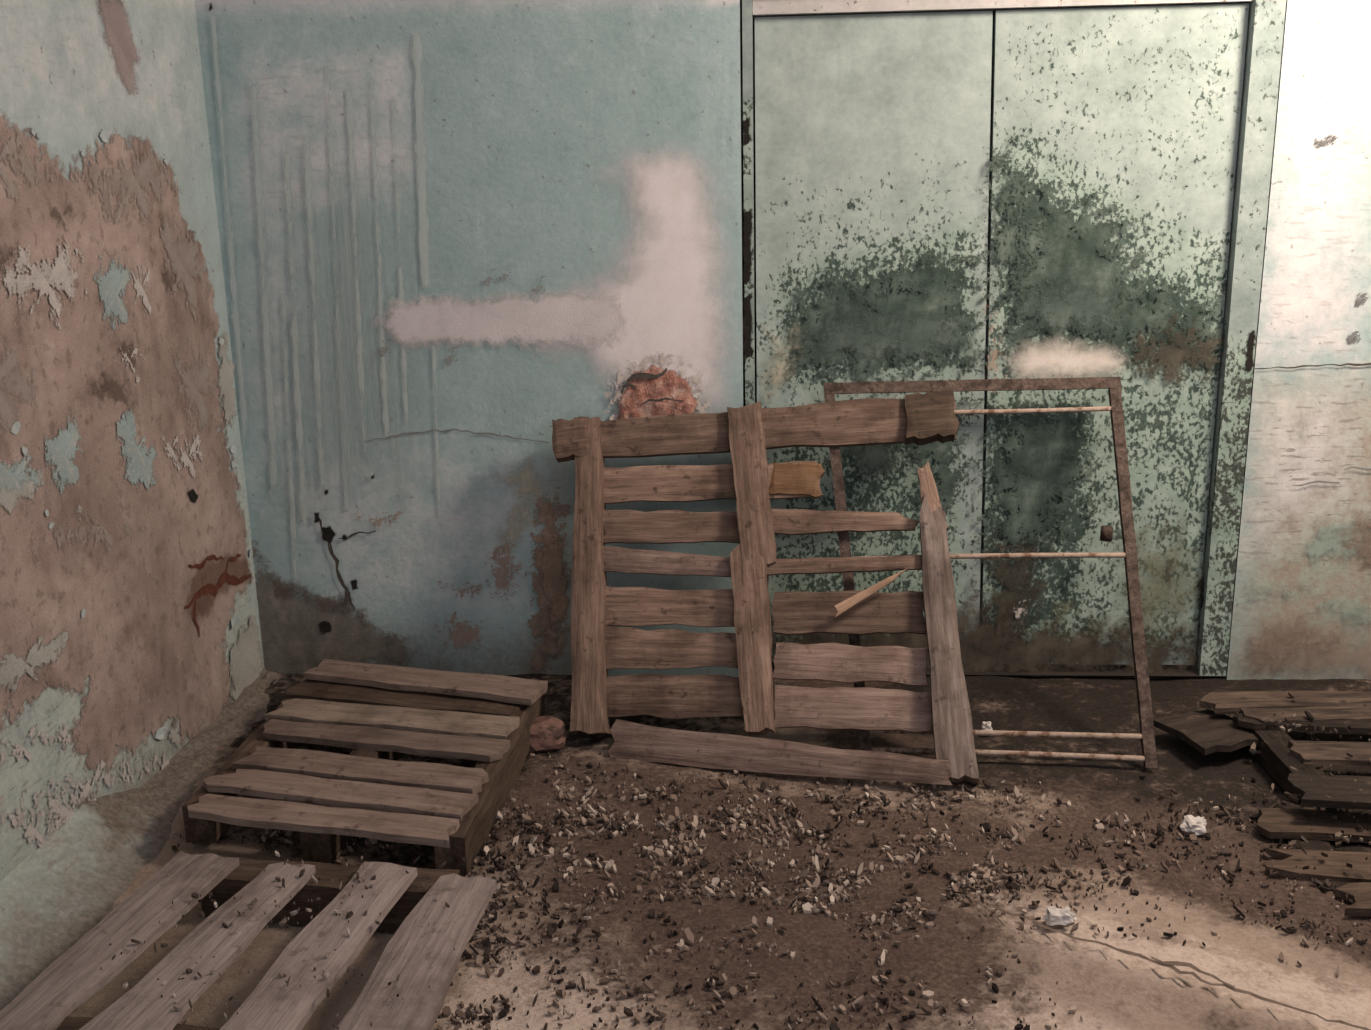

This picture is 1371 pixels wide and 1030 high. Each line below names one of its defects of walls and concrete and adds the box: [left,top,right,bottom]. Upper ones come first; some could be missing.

peeling [98,0,139,94]
leakage [210,15,247,440]
leakage [412,33,430,288]
peeling [0,110,263,856]
leakage [250,66,409,674]
crack [314,489,376,612]
spalling [603,351,711,420]
crack [1255,362,1371,370]